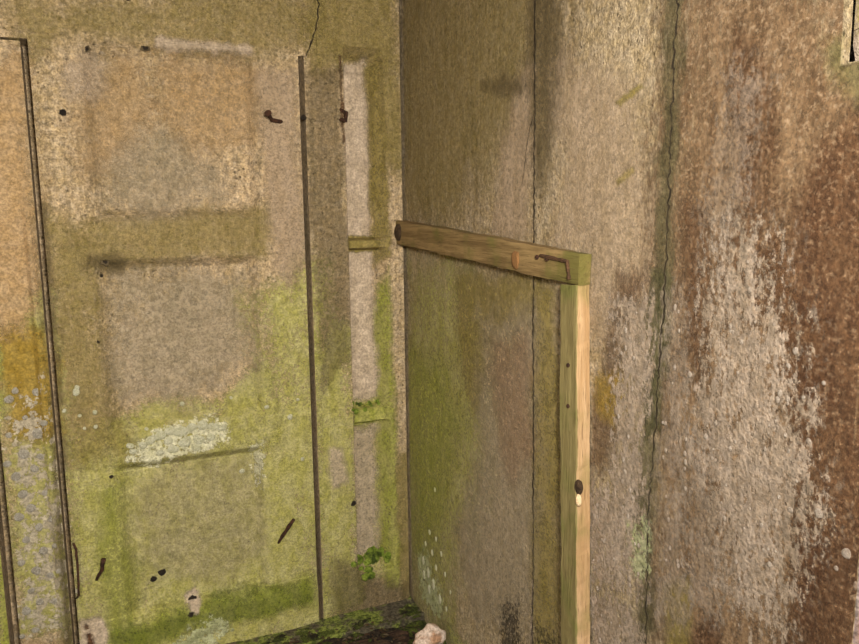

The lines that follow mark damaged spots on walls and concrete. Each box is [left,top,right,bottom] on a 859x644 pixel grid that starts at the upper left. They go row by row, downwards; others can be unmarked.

water stain [0,218,286,488]
water stain [0,554,10,644]
water stain [499,594,560,644]